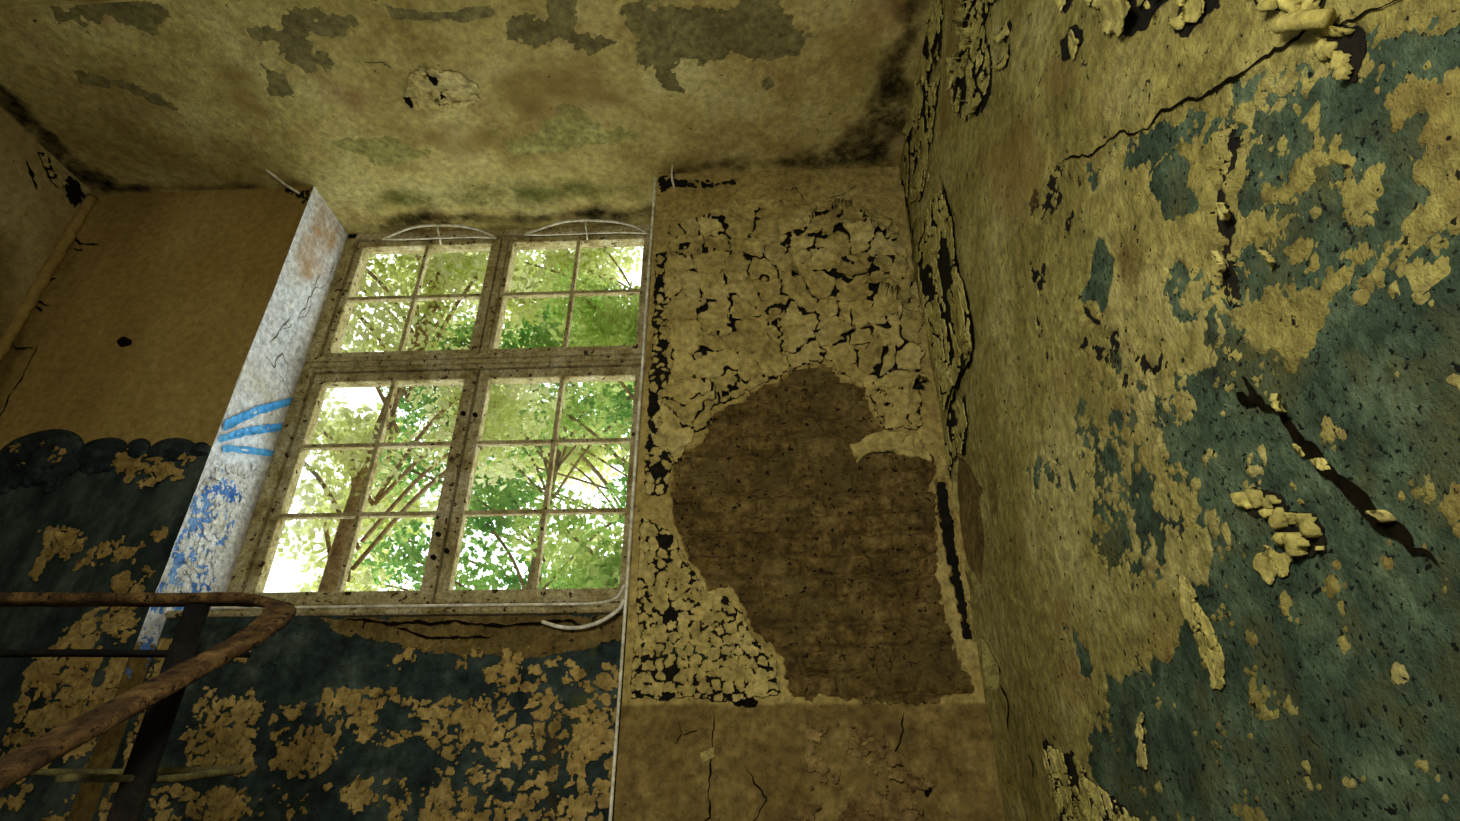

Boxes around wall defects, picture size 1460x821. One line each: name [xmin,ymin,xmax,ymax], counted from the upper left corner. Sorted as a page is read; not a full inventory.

leakage [0,85,148,192]
peeling [386,0,813,94]
leakage [781,0,919,167]
crack [1055,0,1397,167]
flaking render [644,0,1012,705]
peeling [1026,15,1460,821]
crack [1236,376,1437,564]
peeling [0,448,263,757]
spalling [148,614,628,821]
crack [346,618,581,639]
crack [629,515,781,821]
crack [876,713,904,752]